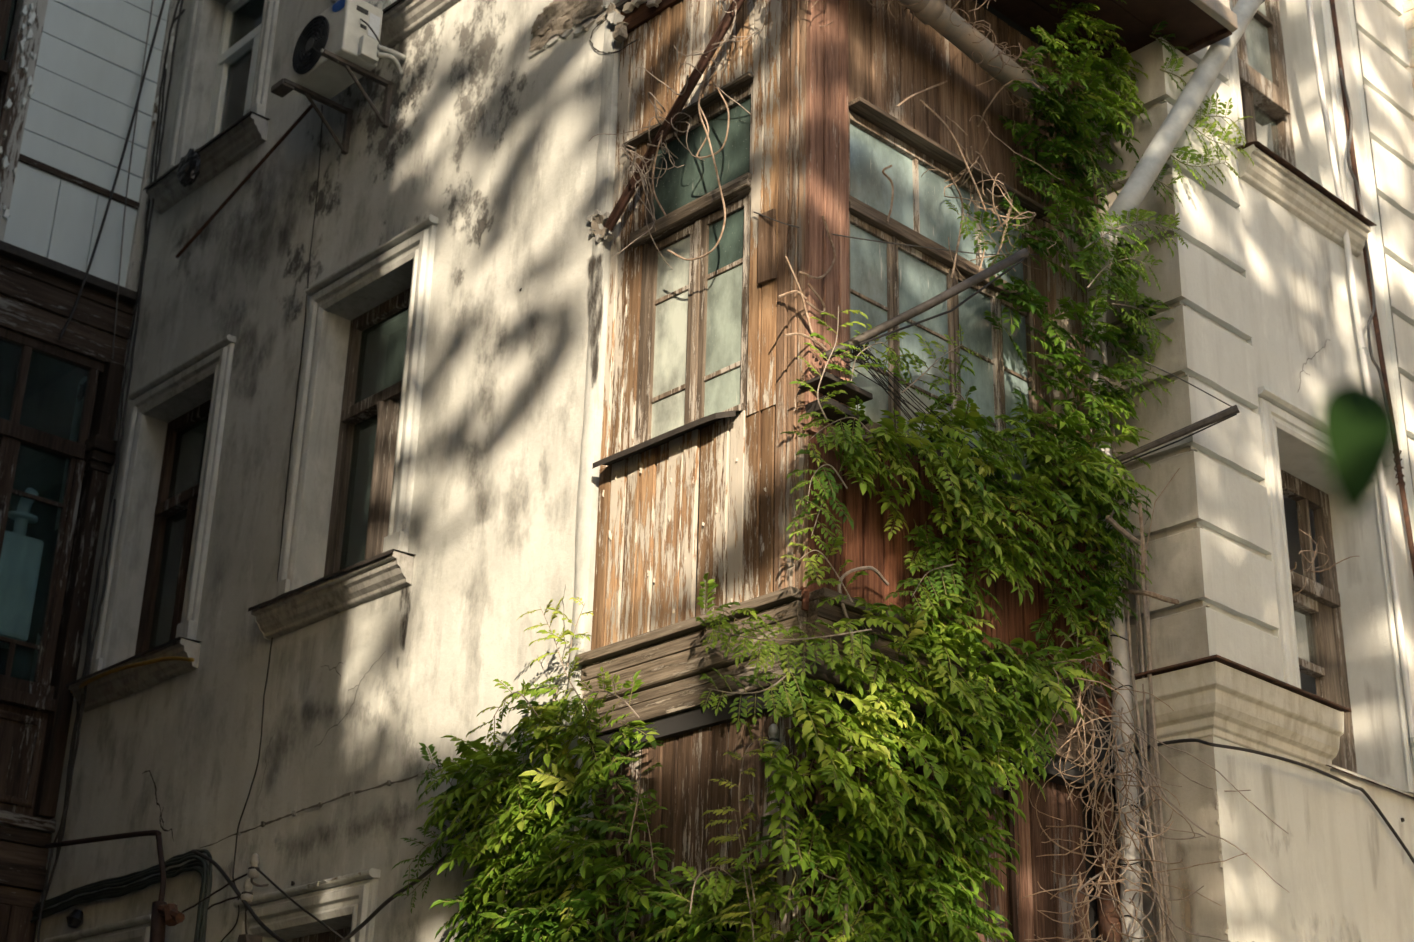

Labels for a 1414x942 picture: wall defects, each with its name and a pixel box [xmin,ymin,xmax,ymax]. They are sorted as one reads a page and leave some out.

peeling [3,3,37,110]
water stain [342,14,444,179]
water stain [455,0,526,169]
spalling [528,0,662,58]
peeling [0,130,17,177]
water stain [231,181,322,320]
water stain [288,135,340,216]
water stain [446,188,493,242]
water stain [400,586,410,648]